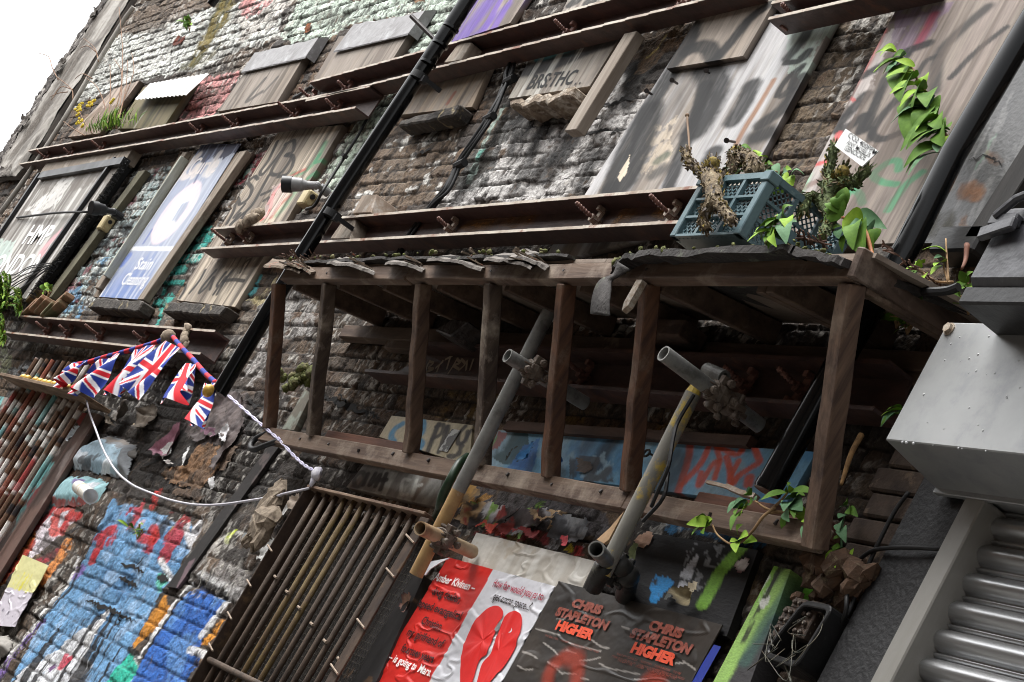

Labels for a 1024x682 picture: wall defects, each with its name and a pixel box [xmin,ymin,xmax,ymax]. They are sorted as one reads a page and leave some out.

spalling [147,390,244,503]
peeling [454,485,588,546]